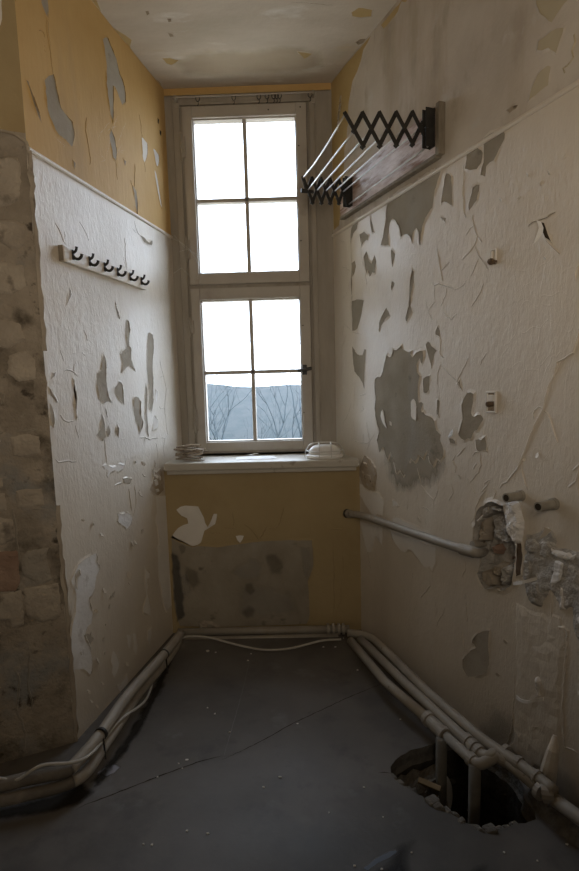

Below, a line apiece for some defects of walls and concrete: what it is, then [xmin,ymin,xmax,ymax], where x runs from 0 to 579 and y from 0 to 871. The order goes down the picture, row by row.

peeling [24,72,75,146]
peeling [101,34,126,164]
peeling [331,36,371,231]
peeling [464,125,507,212]
peeling [349,164,454,332]
flaking render [0,129,101,763]
peeling [96,302,159,441]
peeling [352,324,488,518]
damp [172,555,184,619]
flaking render [470,497,579,641]